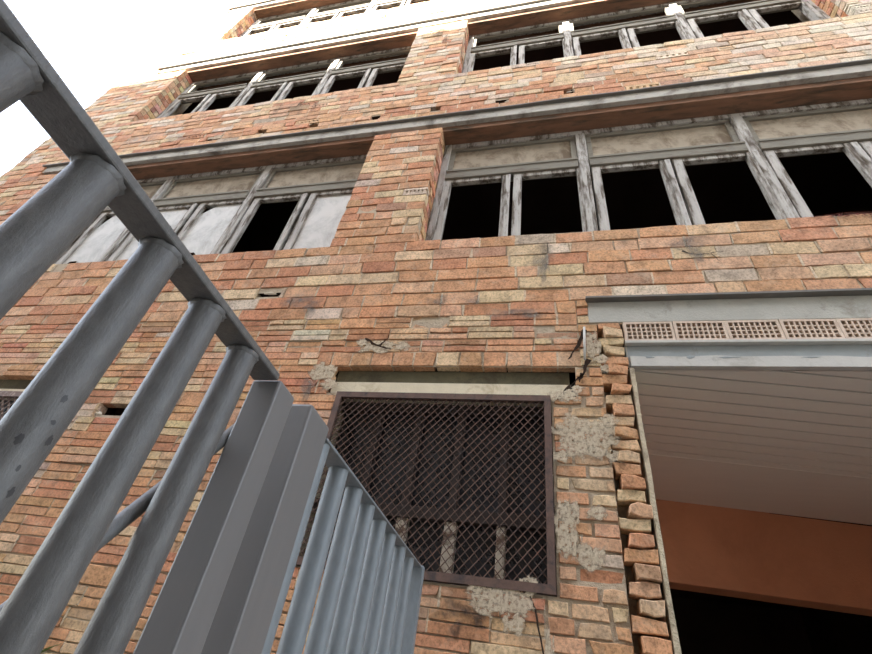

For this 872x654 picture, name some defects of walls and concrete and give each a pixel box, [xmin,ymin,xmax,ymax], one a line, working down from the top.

spalling [356,338,410,353]
peeling [597,414,618,427]
peeling [552,450,568,463]
peeling [587,505,607,521]
peeling [576,543,606,572]
peeling [519,575,538,597]
peeling [502,612,525,636]